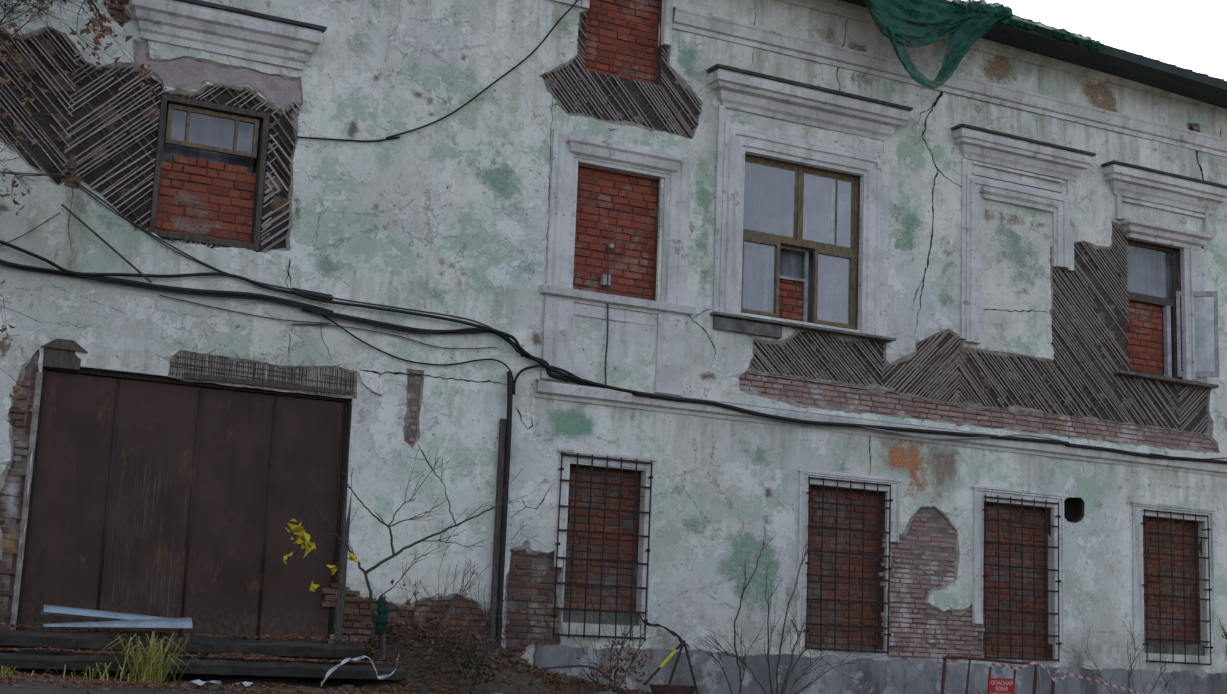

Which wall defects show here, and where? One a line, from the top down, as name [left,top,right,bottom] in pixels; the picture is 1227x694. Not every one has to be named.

spalling [102,0,133,27]
flaking render [0,26,303,252]
flaking render [539,11,703,139]
crack [914,92,961,331]
flaking render [738,221,1219,453]
flaking render [0,349,39,630]
flaking render [403,368,424,447]
damp [552,412,591,435]
corrosion [889,440,925,496]
flaking render [322,540,571,664]
damp [721,533,779,610]
flaking render [878,506,985,663]